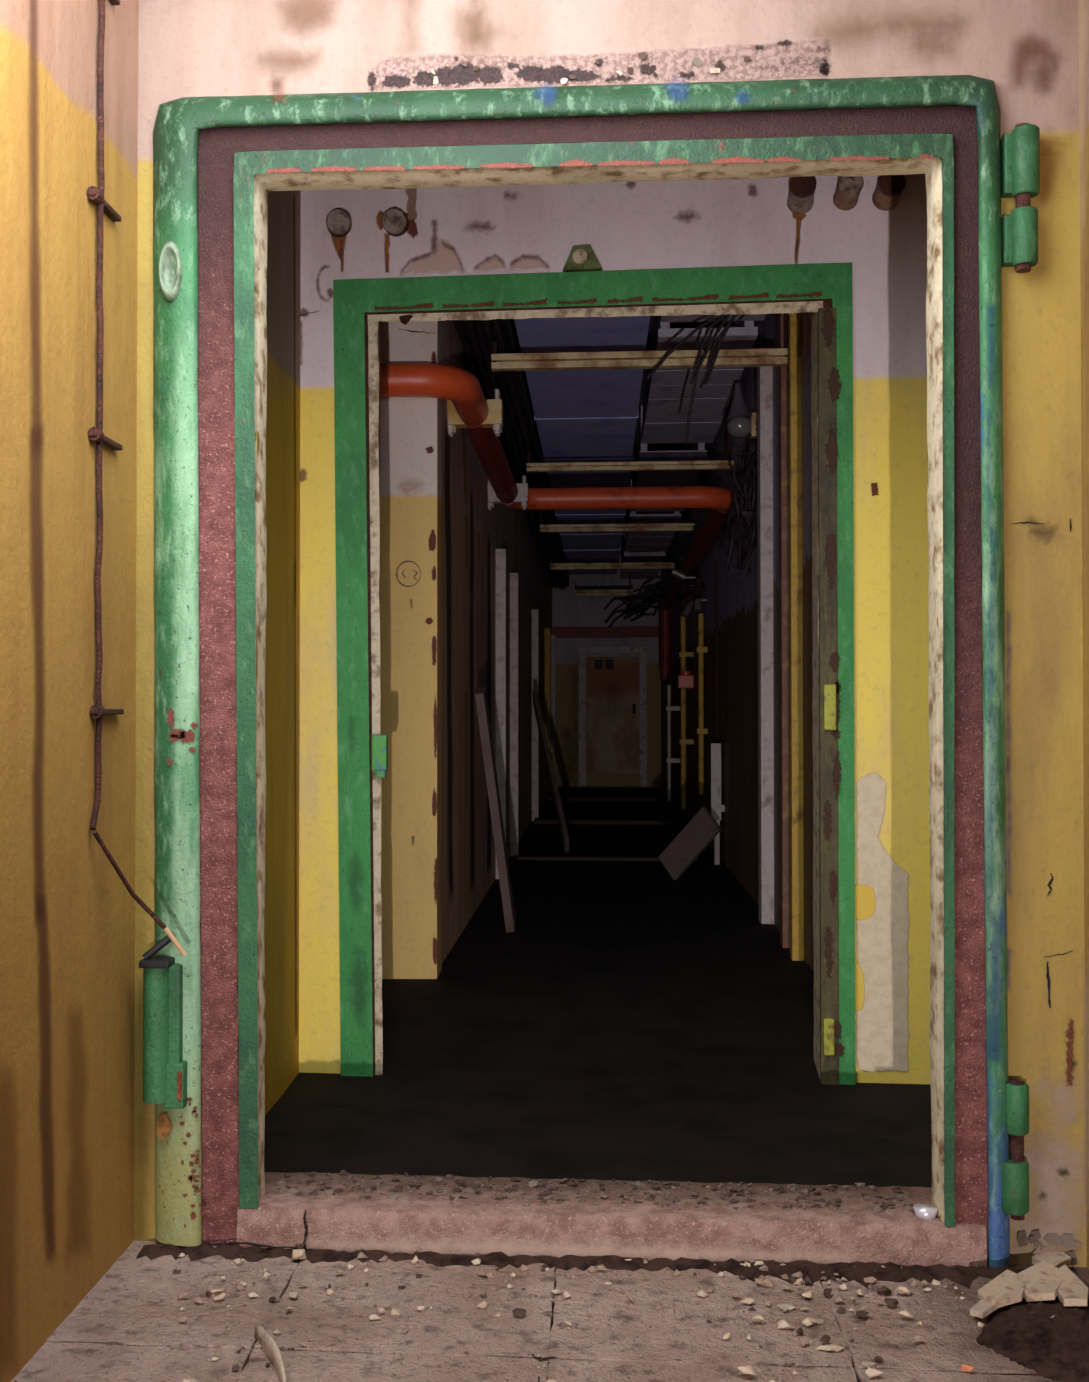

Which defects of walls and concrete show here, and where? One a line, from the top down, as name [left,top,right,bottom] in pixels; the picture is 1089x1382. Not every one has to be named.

flaking render [368,40,830,91]
corrosion [331,235,347,271]
corrosion [377,211,390,272]
corrosion [405,213,418,239]
peeling [827,368,842,402]
peeling [825,424,839,475]
peeling [824,534,837,589]
peeling [823,651,909,1072]